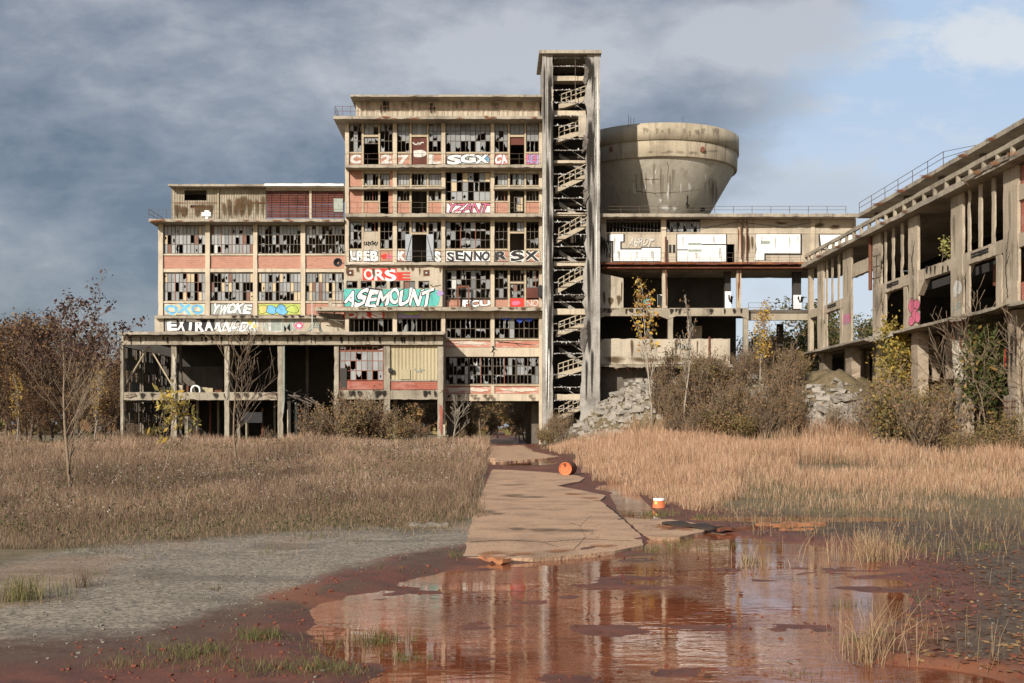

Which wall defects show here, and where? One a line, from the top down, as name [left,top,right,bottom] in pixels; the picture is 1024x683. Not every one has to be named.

damp [174,196,264,216]
damp [660,183,691,211]